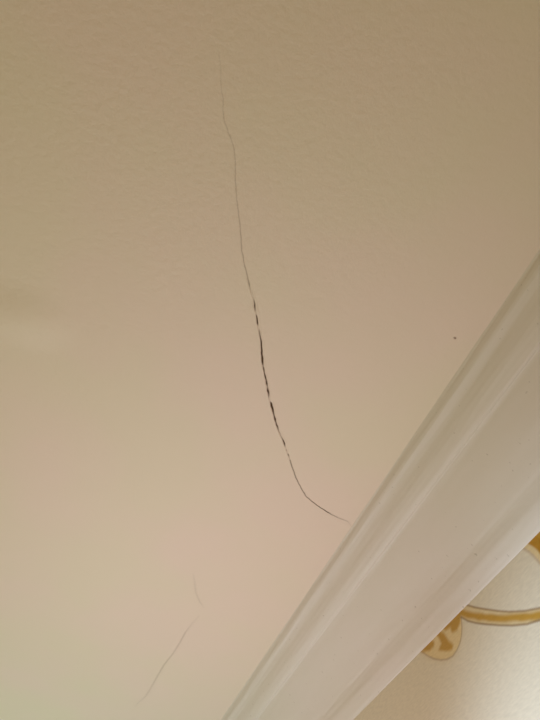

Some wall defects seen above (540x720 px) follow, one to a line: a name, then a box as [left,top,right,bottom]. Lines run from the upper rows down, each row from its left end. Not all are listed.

crack [245,278,292,460]